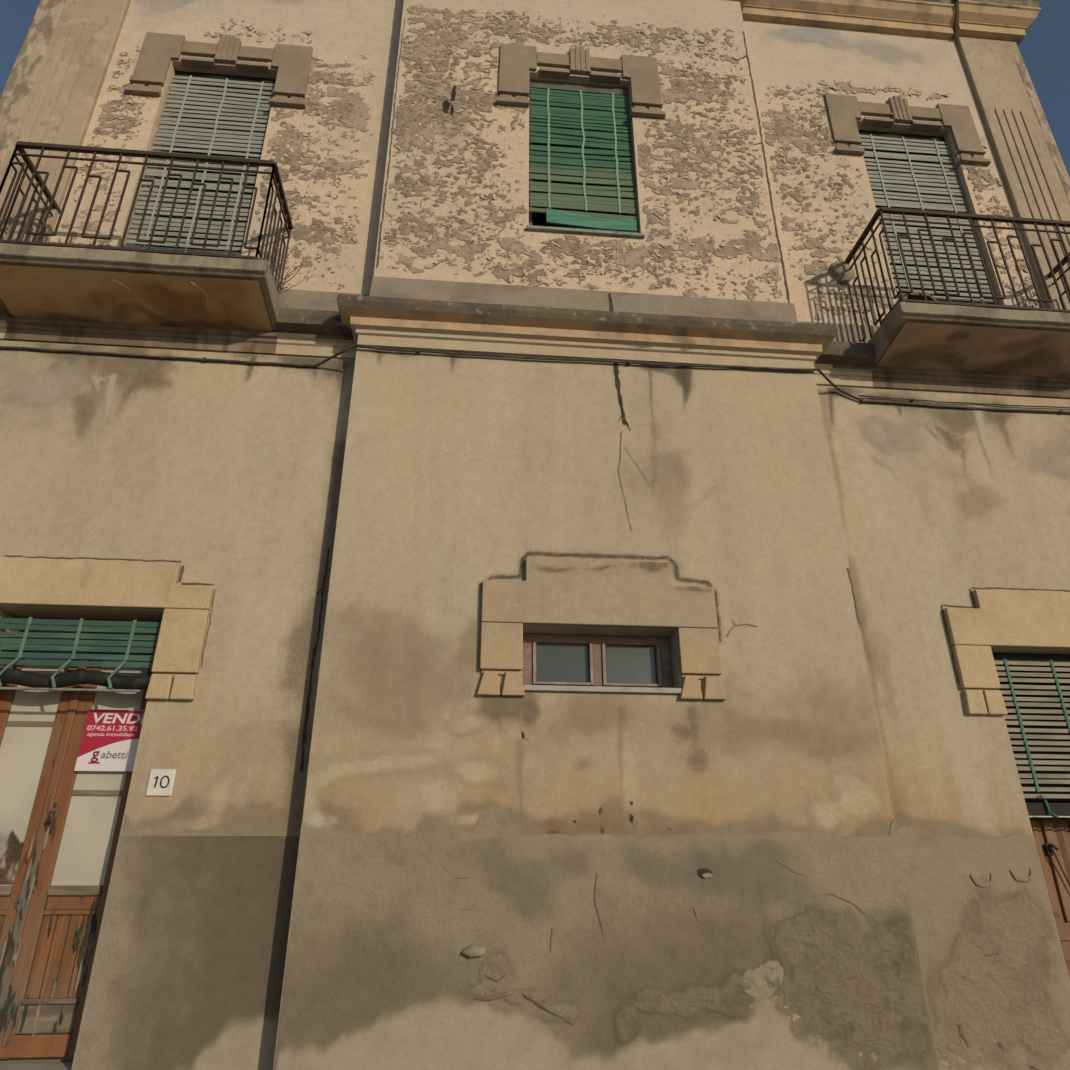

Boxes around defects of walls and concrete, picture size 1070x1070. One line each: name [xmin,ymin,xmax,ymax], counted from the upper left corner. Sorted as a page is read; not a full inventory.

peeling [59,46,153,246]
peeling [204,18,373,289]
crack [607,293,615,311]
peeling [381,6,951,323]
peeling [963,164,1040,308]
damp [0,341,189,445]
crack [614,360,648,530]
damp [823,387,1070,485]
damp [123,434,819,838]
damp [175,984,920,1070]
spalling [743,961,784,1000]